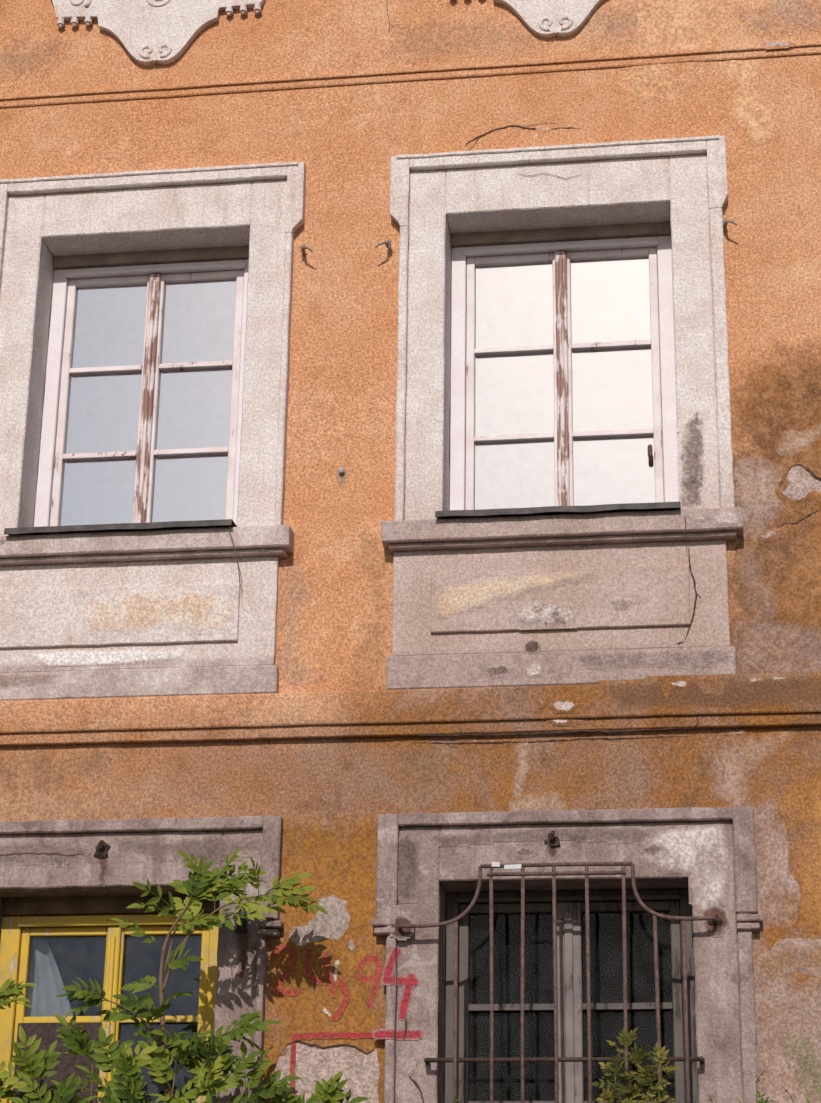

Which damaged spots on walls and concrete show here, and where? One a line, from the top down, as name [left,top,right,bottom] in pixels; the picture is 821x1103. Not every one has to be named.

crack [465,122,581,150]
flaking render [775,422,821,511]
leakage [571,334,821,711]
crack [676,516,699,644]
peeling [506,599,578,630]
flaking render [534,697,589,726]
flaking render [639,821,734,912]
flaking render [287,894,357,952]
rust [388,914,414,940]
rust [701,905,730,937]
peeling [706,726,821,1103]
flaking render [262,1038,385,1103]